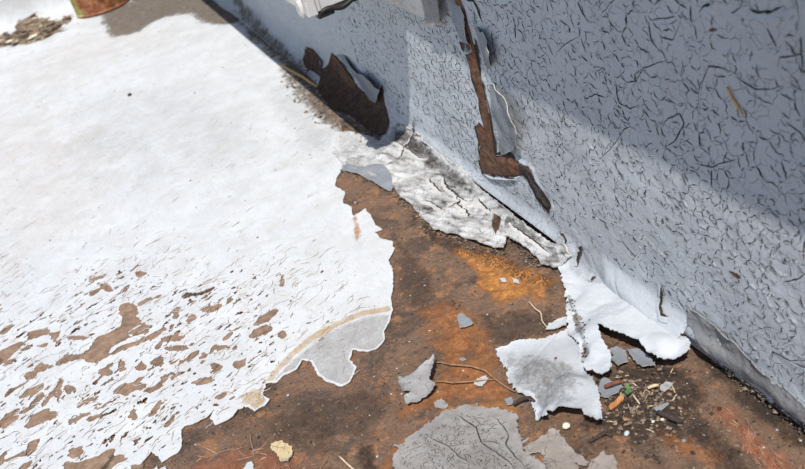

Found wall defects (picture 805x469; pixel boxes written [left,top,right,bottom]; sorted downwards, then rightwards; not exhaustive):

water stain [98,0,380,140]
spalling [302,45,392,139]
crack [338,0,805,404]
rust [456,249,549,302]
peeling [0,265,287,438]
crack [0,207,381,469]
rust [399,304,515,417]
peeling [392,214,701,469]
peeling [0,439,40,469]
peeling [63,447,144,469]
peeling [270,440,293,461]
crack [392,403,536,469]